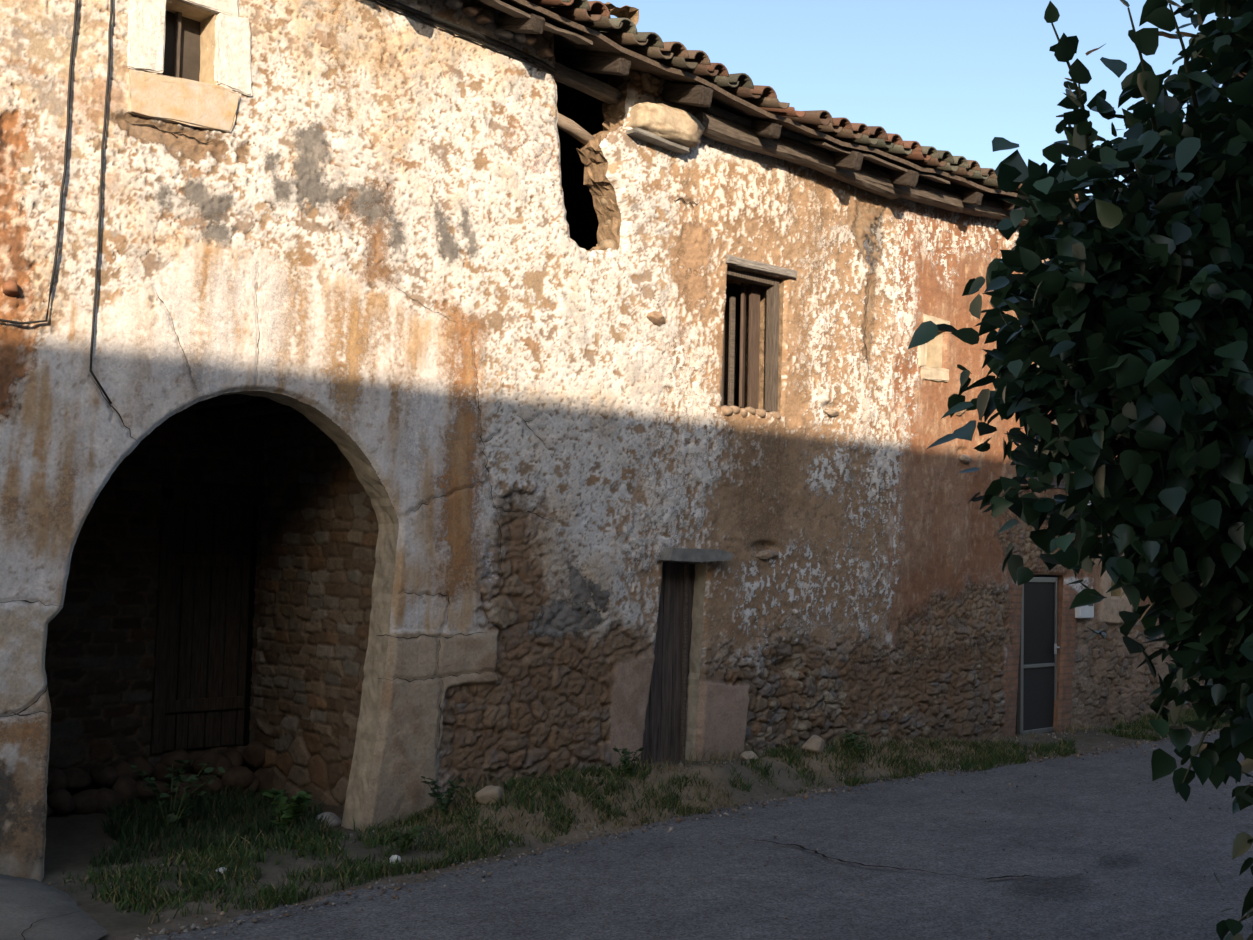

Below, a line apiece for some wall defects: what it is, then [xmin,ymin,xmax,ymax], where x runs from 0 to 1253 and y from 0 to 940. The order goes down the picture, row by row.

crack [125,120,218,145]
leakage [155,181,237,243]
leakage [265,122,405,253]
spalling [0,108,43,423]
crack [155,290,195,384]
crack [90,376,137,441]
peeling [735,202,1021,673]
spalling [998,497,1072,575]